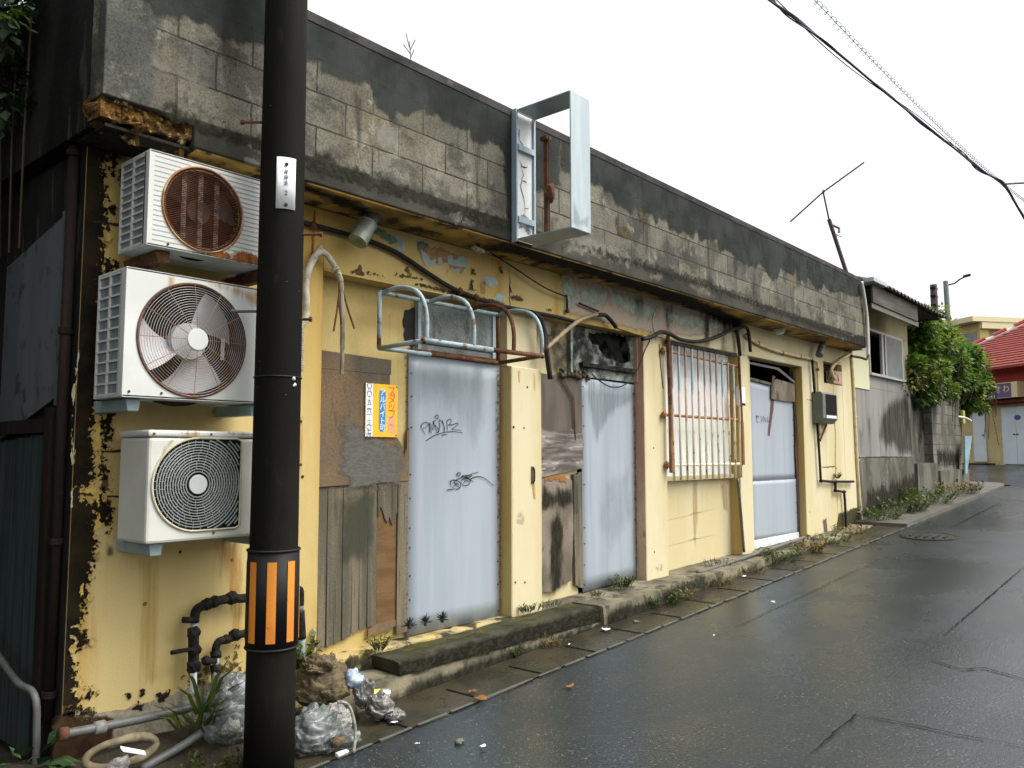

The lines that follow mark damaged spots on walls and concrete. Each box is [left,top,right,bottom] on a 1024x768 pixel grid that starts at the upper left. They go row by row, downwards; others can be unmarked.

water stain [148,0,265,44]
water stain [307,20,512,222]
water stain [536,128,570,189]
corrosion [207,251,258,265]
peeling [350,228,523,304]
water stain [590,154,863,309]
peeling [51,150,211,761]
water stain [865,460,916,515]
water stain [882,397,924,453]
water stain [937,450,959,468]
water stain [542,489,573,593]